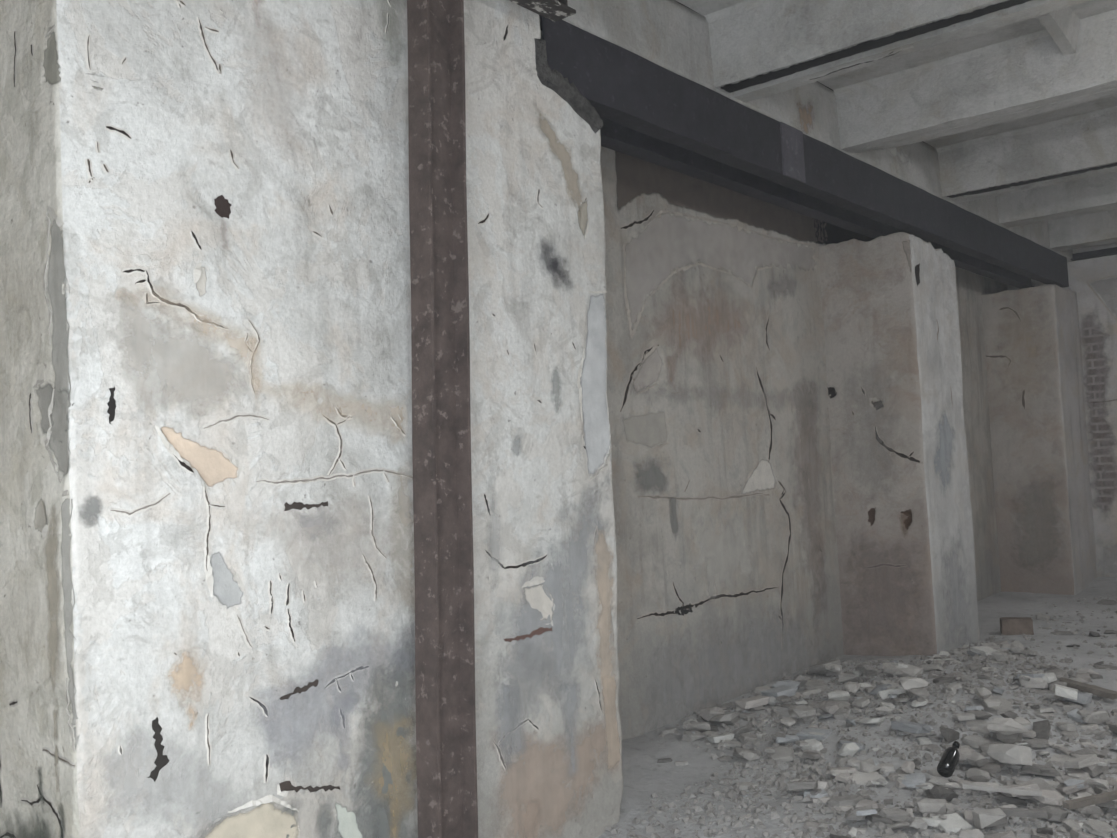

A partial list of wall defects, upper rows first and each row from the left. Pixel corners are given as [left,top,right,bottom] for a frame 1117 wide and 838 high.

crack [122,267,270,430]
spalling [155,425,243,486]
crack [637,315,811,648]
crack [874,426,923,464]
peeling [206,552,245,608]
peeling [504,580,554,642]
crack [42,747,77,768]
crack [116,745,124,755]
crack [0,746,65,838]
water stain [11,806,64,838]
spalling [205,781,362,838]